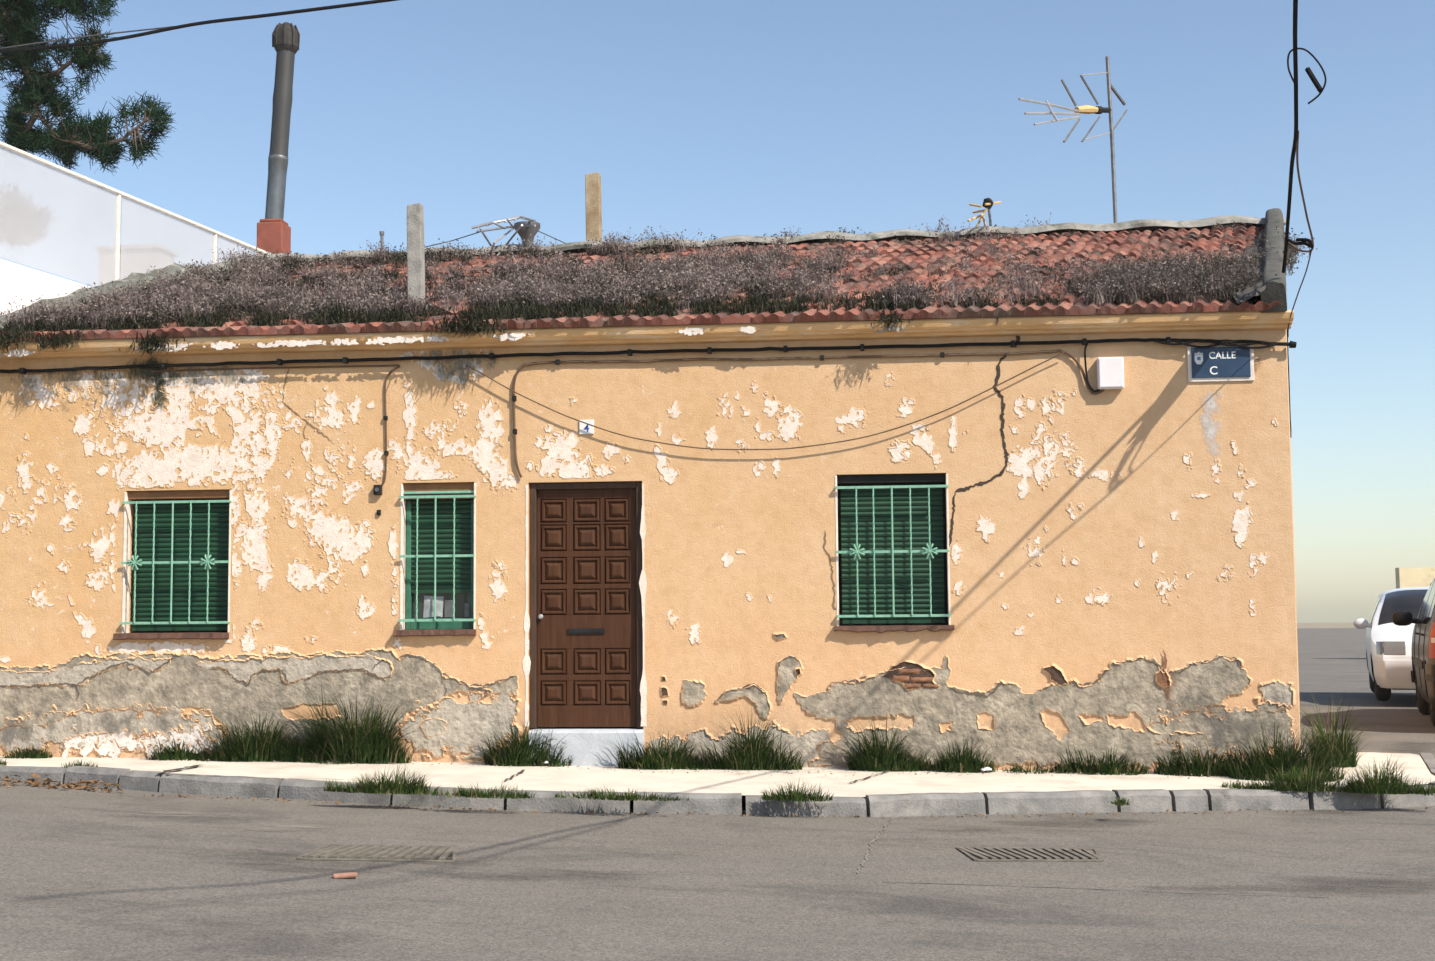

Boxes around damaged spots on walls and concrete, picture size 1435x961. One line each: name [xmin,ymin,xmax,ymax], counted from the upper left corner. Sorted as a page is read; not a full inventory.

peeling [679,327,703,336]
peeling [652,400,686,486]
peeling [704,380,803,479]
peeling [835,406,870,434]
peeling [884,371,969,470]
crack [949,317,1021,546]
peeling [1006,388,1122,500]
spalling [0,333,632,762]
peeling [975,515,997,544]
peeling [1133,536,1194,606]
peeling [1190,440,1269,582]
spalling [649,632,1298,770]